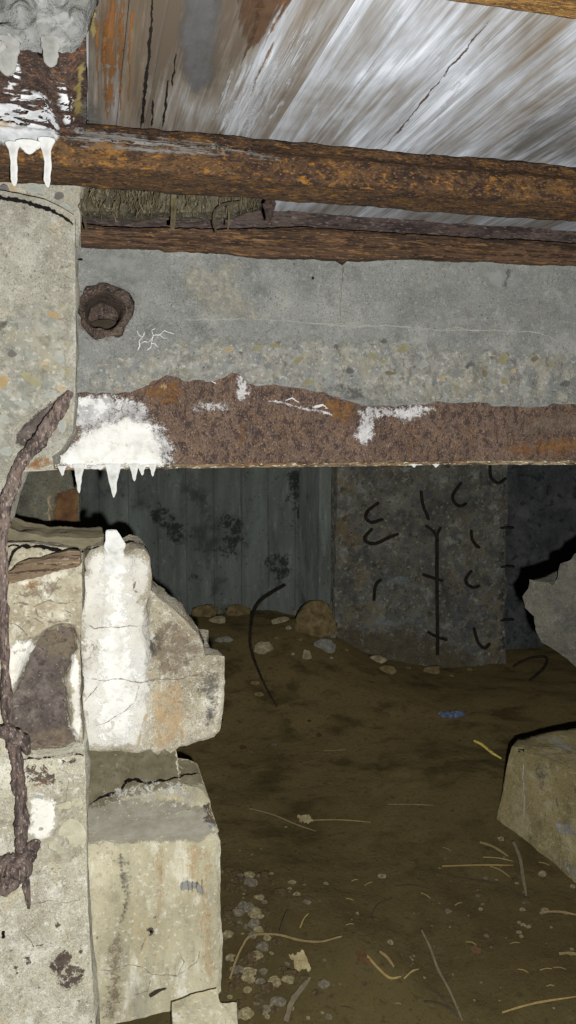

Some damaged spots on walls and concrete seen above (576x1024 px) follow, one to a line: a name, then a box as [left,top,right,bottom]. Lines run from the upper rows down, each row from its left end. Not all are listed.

damp [0,0,320,188]
damp [55,394,177,498]
damp [342,385,436,446]
crack [24,753,197,831]